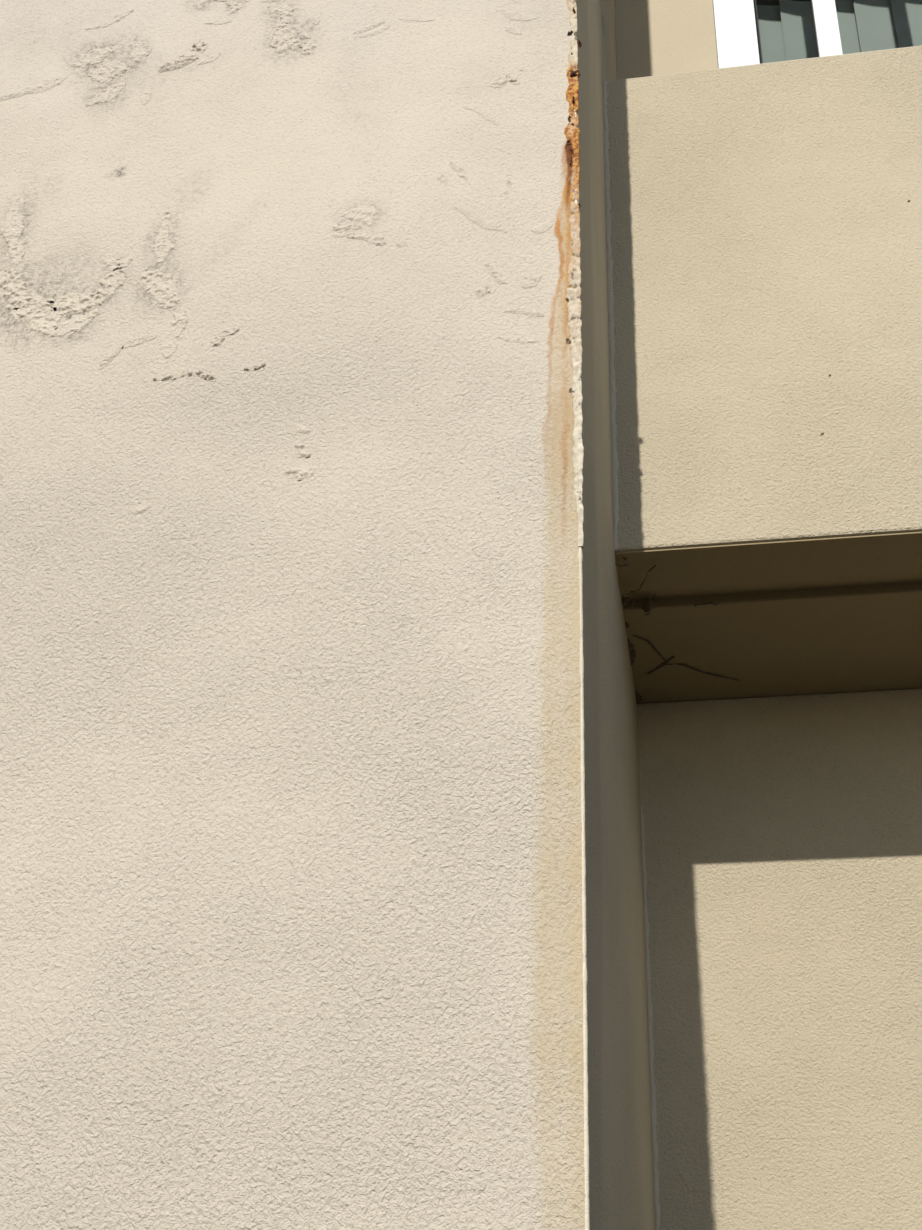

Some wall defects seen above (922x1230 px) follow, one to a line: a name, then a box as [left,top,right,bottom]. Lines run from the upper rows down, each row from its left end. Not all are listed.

peeling [68,40,152,106]
peeling [159,40,221,73]
peeling [192,0,320,54]
corrosion [555,142,576,282]
peeling [0,196,189,358]
crack [633,635,740,681]